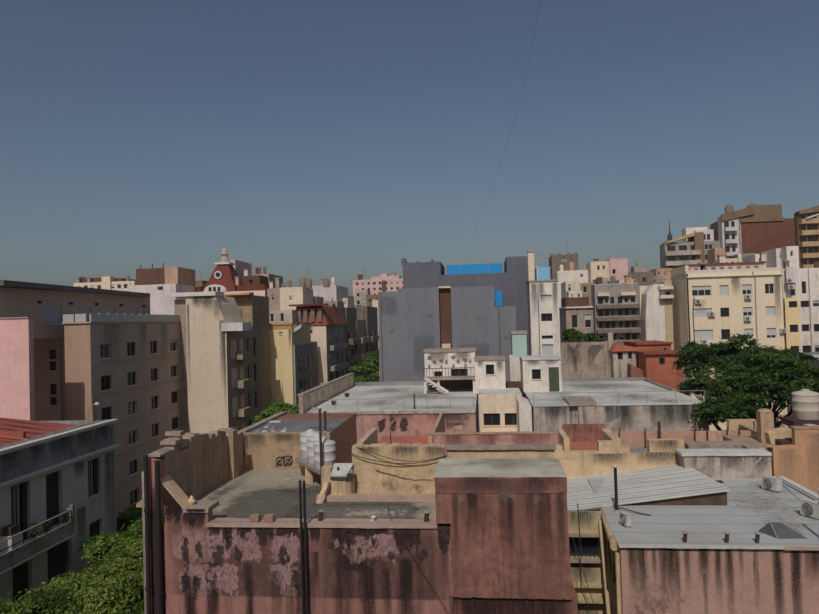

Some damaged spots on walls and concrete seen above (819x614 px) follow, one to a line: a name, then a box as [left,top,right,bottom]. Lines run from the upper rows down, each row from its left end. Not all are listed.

leakage [150,487,205,614]
peeling [170,526,304,598]
leakage [212,485,421,614]
peeling [328,531,370,564]
leakage [437,518,456,555]
leakage [630,548,688,570]
leakage [793,550,819,597]
leakage [456,597,563,614]